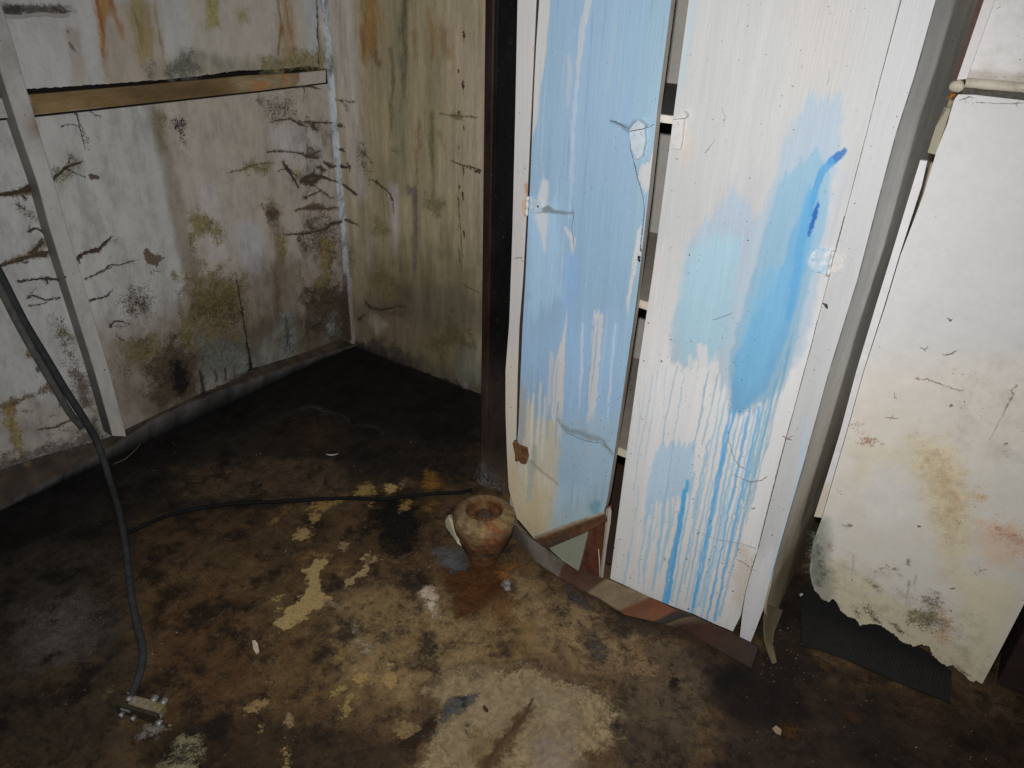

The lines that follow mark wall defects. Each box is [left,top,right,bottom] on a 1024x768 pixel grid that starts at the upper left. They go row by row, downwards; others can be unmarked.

crack [0,109,101,307]
crack [230,85,395,237]
crack [76,236,139,342]
damp [109,210,254,407]
crack [235,272,258,371]
damp [852,588,953,634]